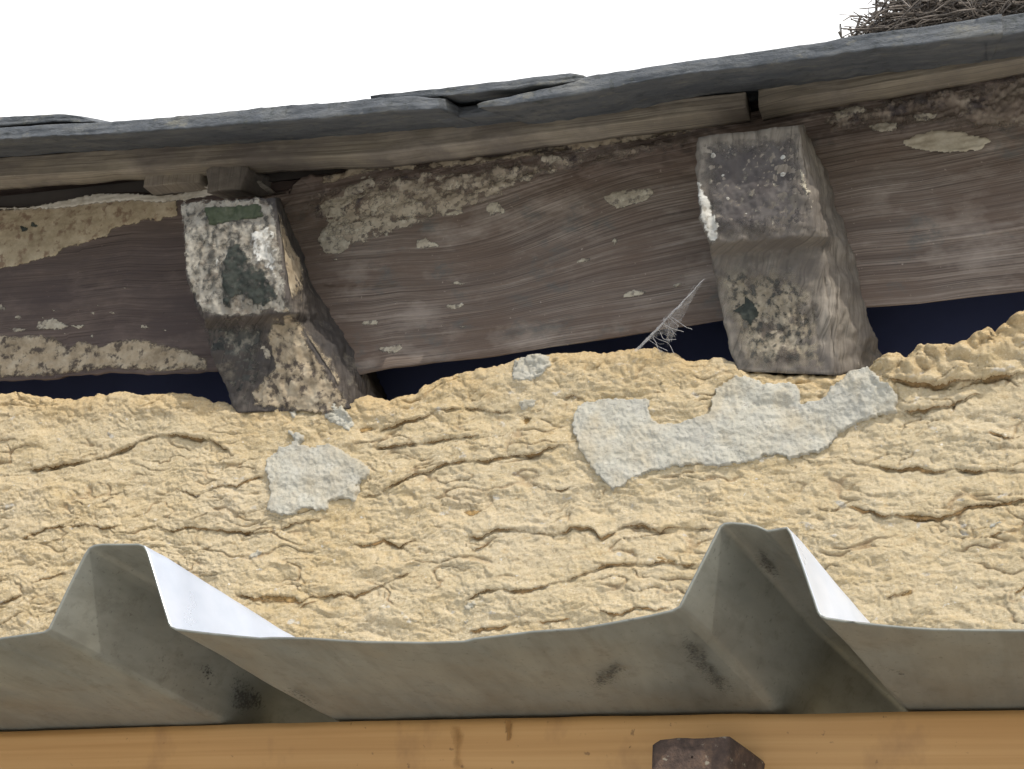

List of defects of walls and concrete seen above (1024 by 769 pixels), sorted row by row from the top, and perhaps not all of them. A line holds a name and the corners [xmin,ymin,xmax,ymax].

leakage [185,205,280,309]
leakage [728,273,814,362]
crack [32,434,227,472]
crack [369,408,554,496]
crack [879,466,1014,474]
crack [24,525,115,540]
crack [168,520,311,536]
crack [360,539,411,548]
crack [562,525,709,579]
crack [851,499,1024,522]
crack [241,573,408,608]
crack [470,585,547,599]